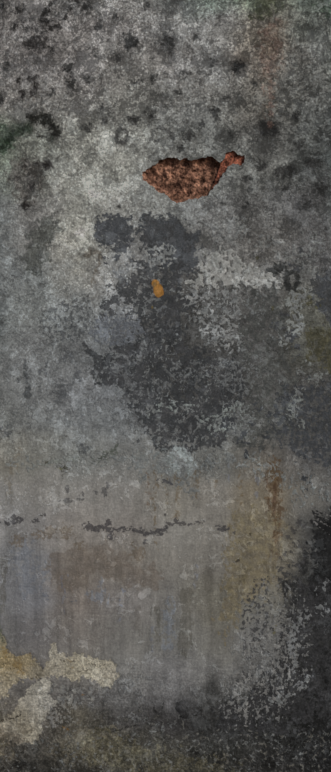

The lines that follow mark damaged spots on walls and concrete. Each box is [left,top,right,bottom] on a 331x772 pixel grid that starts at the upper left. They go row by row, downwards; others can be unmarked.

spalling [142,151,245,203]
leakage [82,246,104,285]
corrosion [151,279,165,310]
spalling [81,513,253,546]
leakage [279,505,331,619]
peeling [0,519,331,772]
leakage [302,641,331,772]